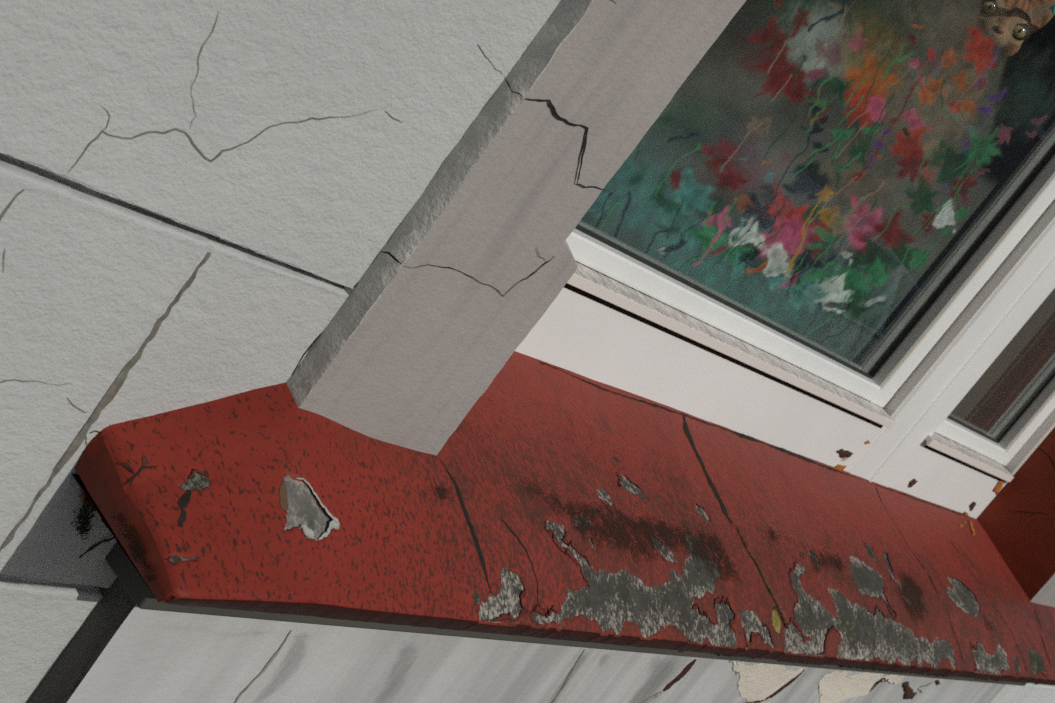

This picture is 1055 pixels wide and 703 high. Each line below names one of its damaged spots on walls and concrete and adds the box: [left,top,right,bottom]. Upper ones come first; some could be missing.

crack [478,45,604,190]
crack [0,12,402,588]
crack [380,247,555,297]
peeling [177,469,210,491]
peeling [279,475,340,541]
crack [441,461,492,593]
leakage [543,492,738,579]
crack [539,361,973,659]
peeling [473,487,955,703]
peeling [947,577,979,619]
crack [235,630,292,703]
peeling [970,642,1047,677]